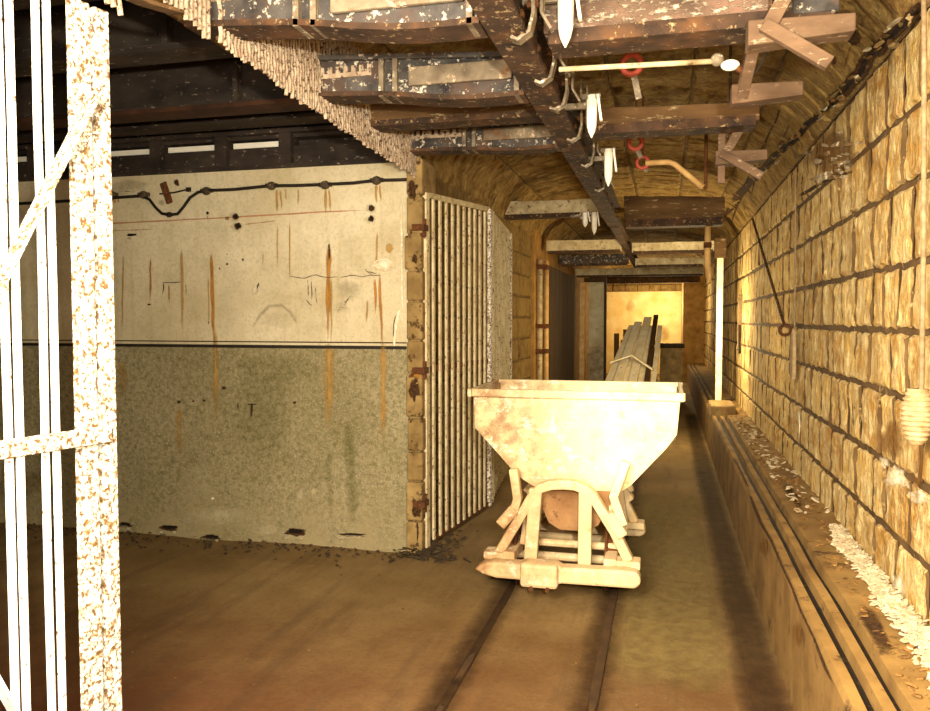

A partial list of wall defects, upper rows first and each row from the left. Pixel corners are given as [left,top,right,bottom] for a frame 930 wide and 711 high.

rust [192,256,226,402]
rust [366,278,383,335]
leakage [860,607,891,651]